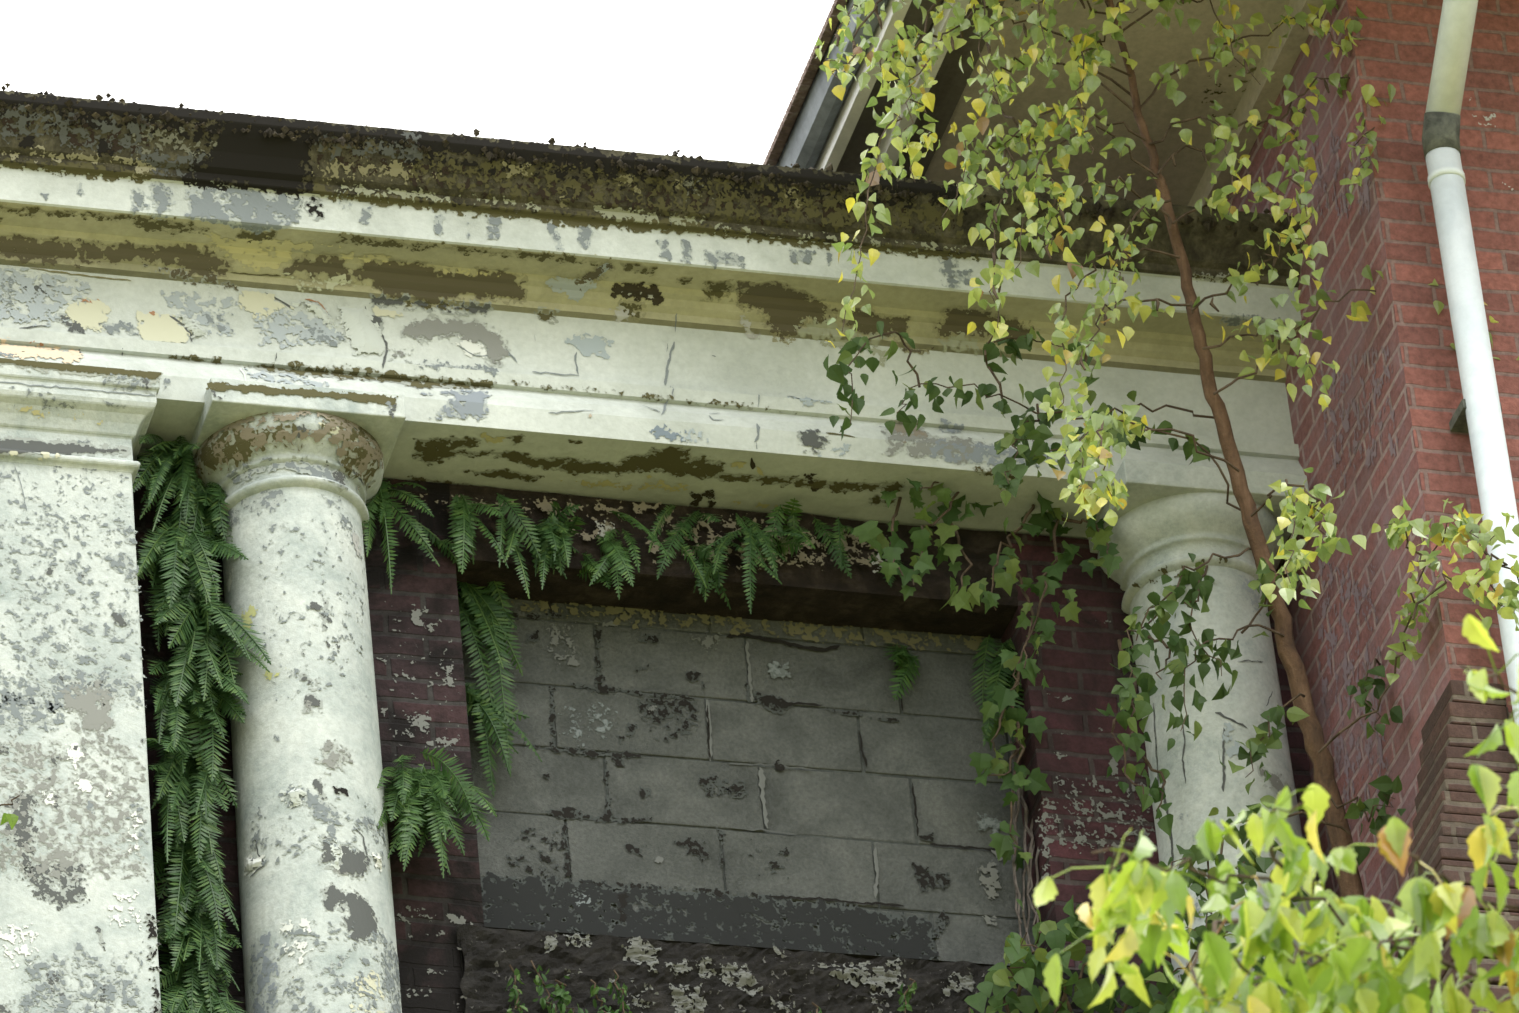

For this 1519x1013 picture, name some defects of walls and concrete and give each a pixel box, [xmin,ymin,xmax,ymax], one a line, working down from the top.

peeling [334,184,541,212]
damp [0,91,980,304]
peeling [593,205,967,254]
damp [0,352,222,410]
peeling [0,232,911,516]
spalling [932,306,1041,345]
spalling [879,417,1071,468]
damp [193,324,797,714]
damp [0,435,153,911]
damp [480,611,951,960]
spalling [317,834,384,945]
damp [0,913,162,1013]